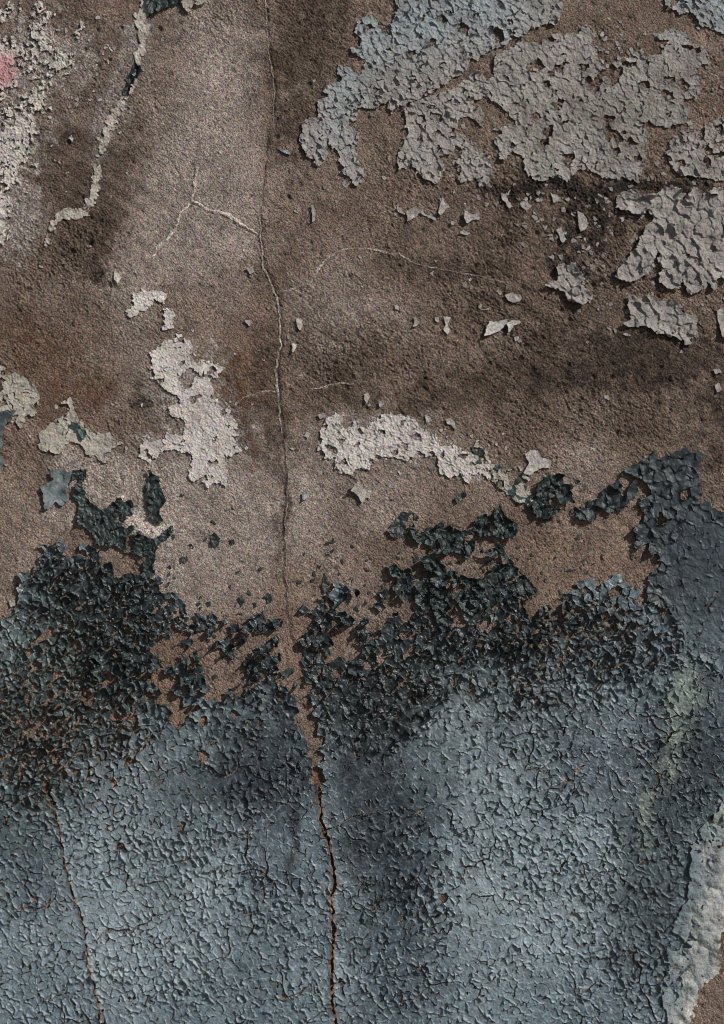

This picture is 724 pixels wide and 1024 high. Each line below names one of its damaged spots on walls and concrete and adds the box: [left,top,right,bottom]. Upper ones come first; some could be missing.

peeling [0,0,76,246]
peeling [44,63,145,246]
crack [264,0,277,144]
peeling [299,0,724,345]
crack [150,167,474,639]
peeling [0,288,724,1024]
crack [45,783,101,1024]
crack [312,769,337,1024]